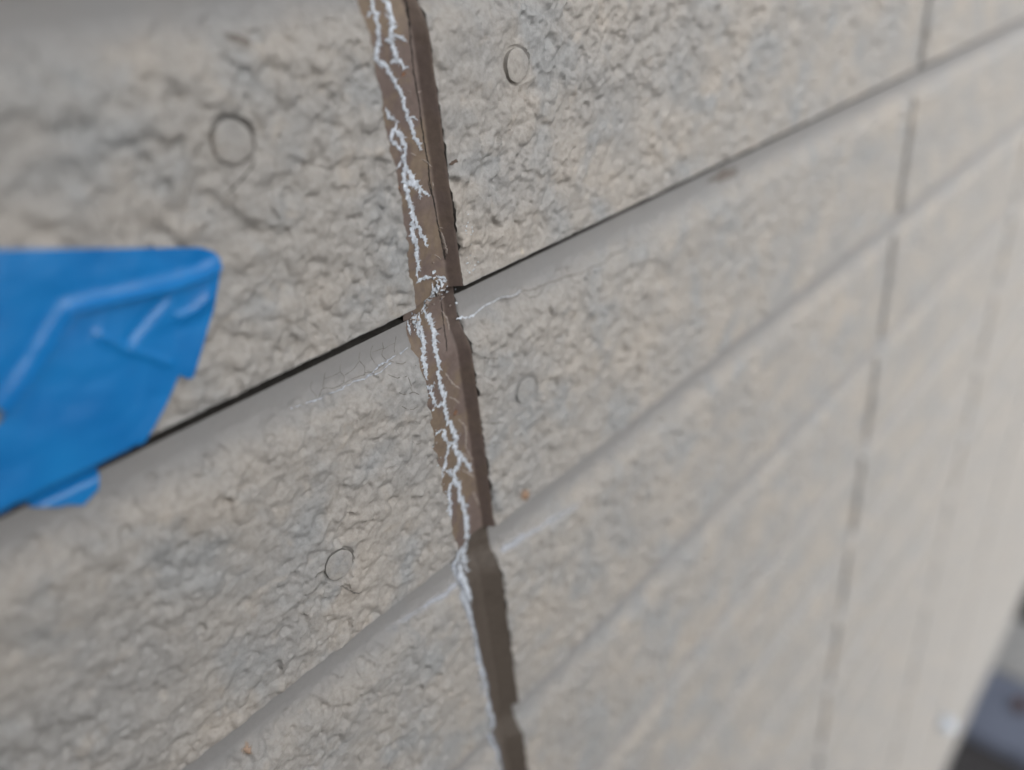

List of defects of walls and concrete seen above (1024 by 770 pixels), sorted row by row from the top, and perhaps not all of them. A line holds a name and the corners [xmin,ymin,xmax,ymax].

peeling [410,227,458,331]
crack [290,0,639,550]
peeling [451,546,473,602]